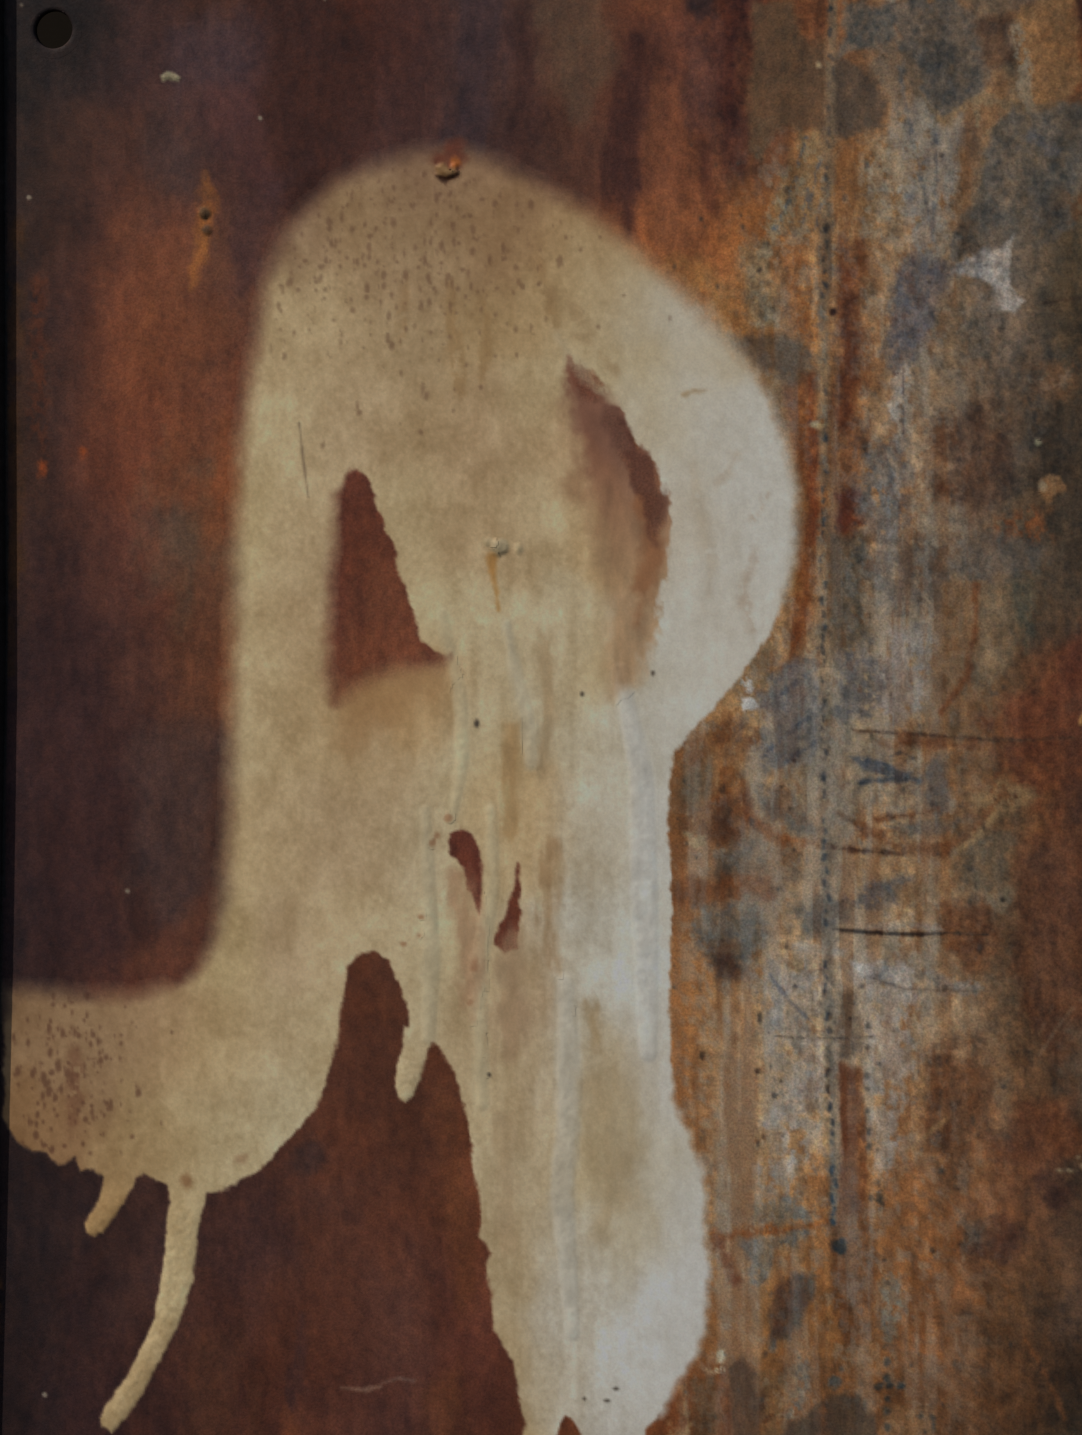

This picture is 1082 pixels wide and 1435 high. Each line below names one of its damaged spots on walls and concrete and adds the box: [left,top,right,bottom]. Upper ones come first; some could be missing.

corrosion [587,21,665,237]
corrosion [337,539,427,677]
corrosion [563,386,673,637]
corrosion [765,227,878,672]
corrosion [919,386,1025,528]
corrosion [670,707,764,847]
corrosion [481,829,569,1077]
corrosion [672,865,782,912]
corrosion [416,1075,498,1343]
corrosion [569,990,654,1260]
corrosion [837,1063,872,1201]
corrosion [899,1026,1082,1221]